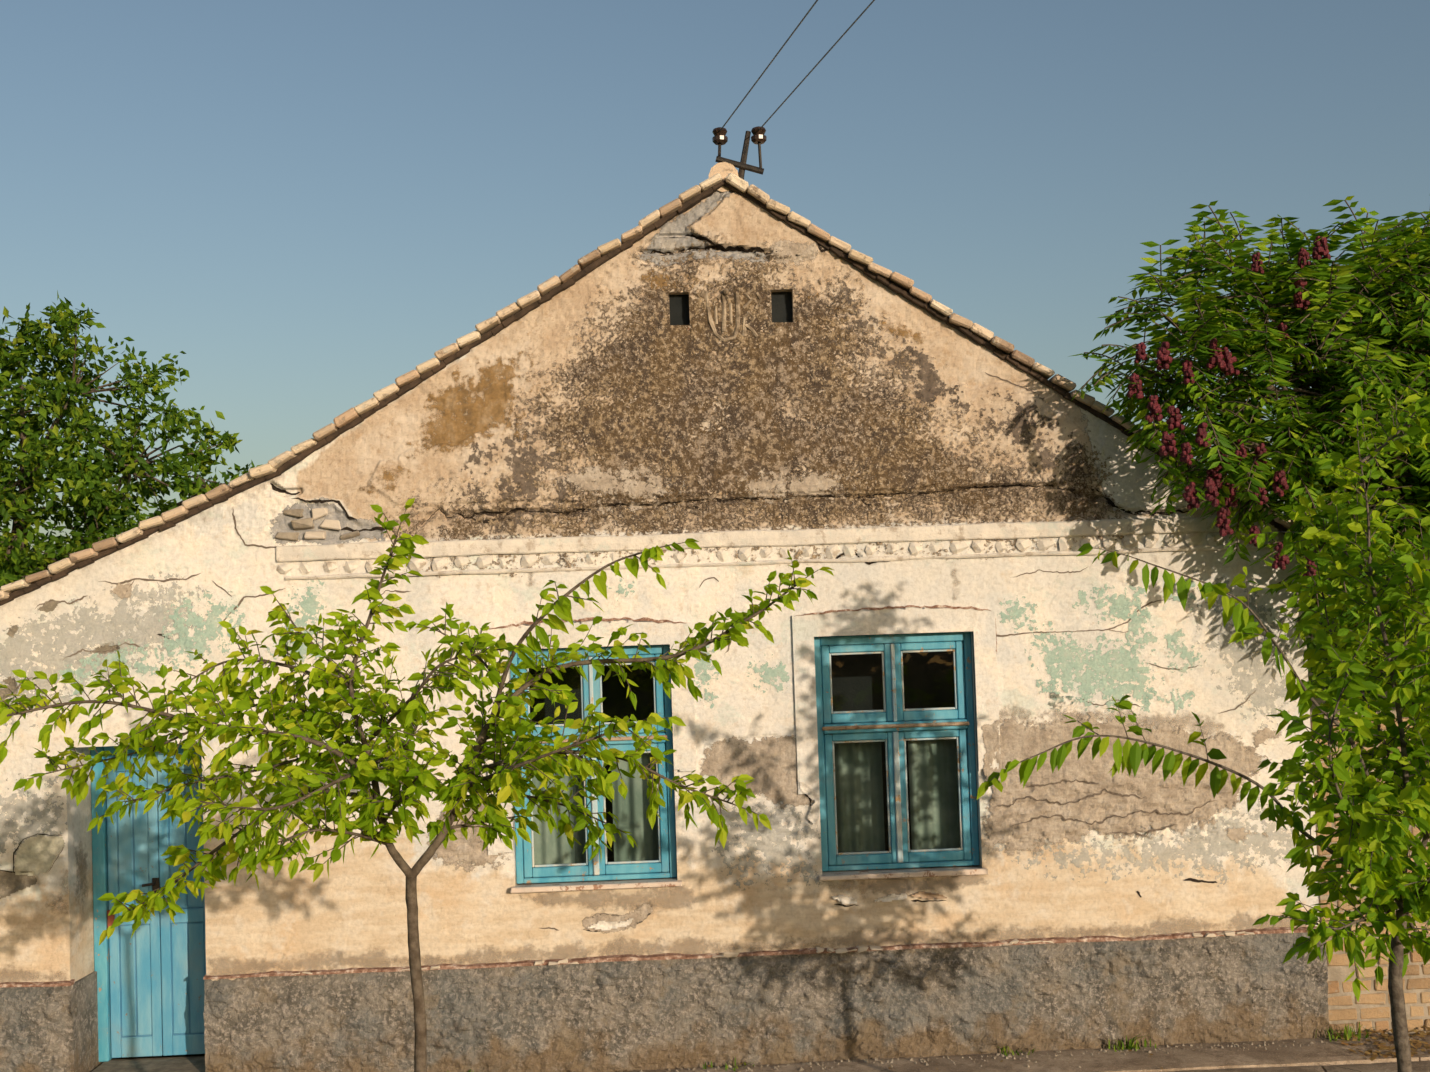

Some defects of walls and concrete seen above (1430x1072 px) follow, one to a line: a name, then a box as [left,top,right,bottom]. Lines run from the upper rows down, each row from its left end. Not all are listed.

crack [640,234,830,256]
leakage [885,331,945,409]
leakage [1015,394,1059,430]
crack [232,509,290,549]
crack [421,484,1189,525]
crack [98,573,286,626]
peeling [796,570,1297,747]
peeling [982,720,1003,781]
peeling [0,776,68,899]
peeling [700,735,821,889]
peeling [987,797,1317,887]
spalling [582,902,654,933]